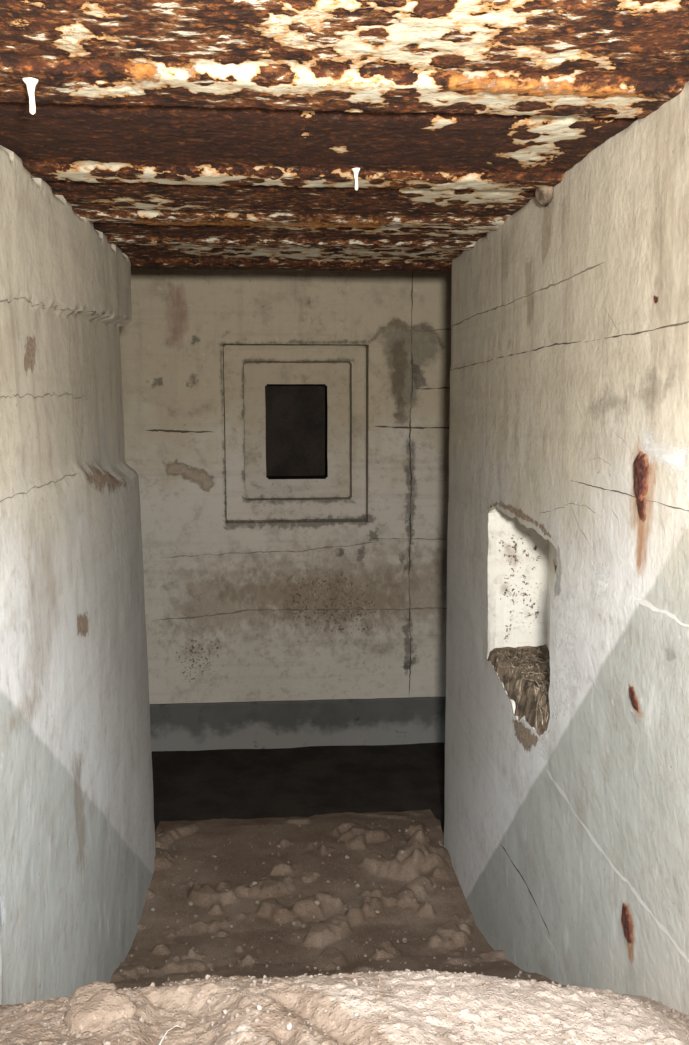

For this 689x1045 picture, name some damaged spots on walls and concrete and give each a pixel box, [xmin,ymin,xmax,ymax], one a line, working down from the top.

rust [122,61,159,83]
rust [448,72,648,99]
crack [0,473,76,502]
spalling [83,465,127,492]
peeling [167,461,213,490]
crack [157,262,689,697]
rust [633,451,649,521]
spalling [490,501,551,537]
rust [629,686,639,713]
spalling [513,720,546,756]
crack [501,845,560,961]
rust [621,903,633,943]